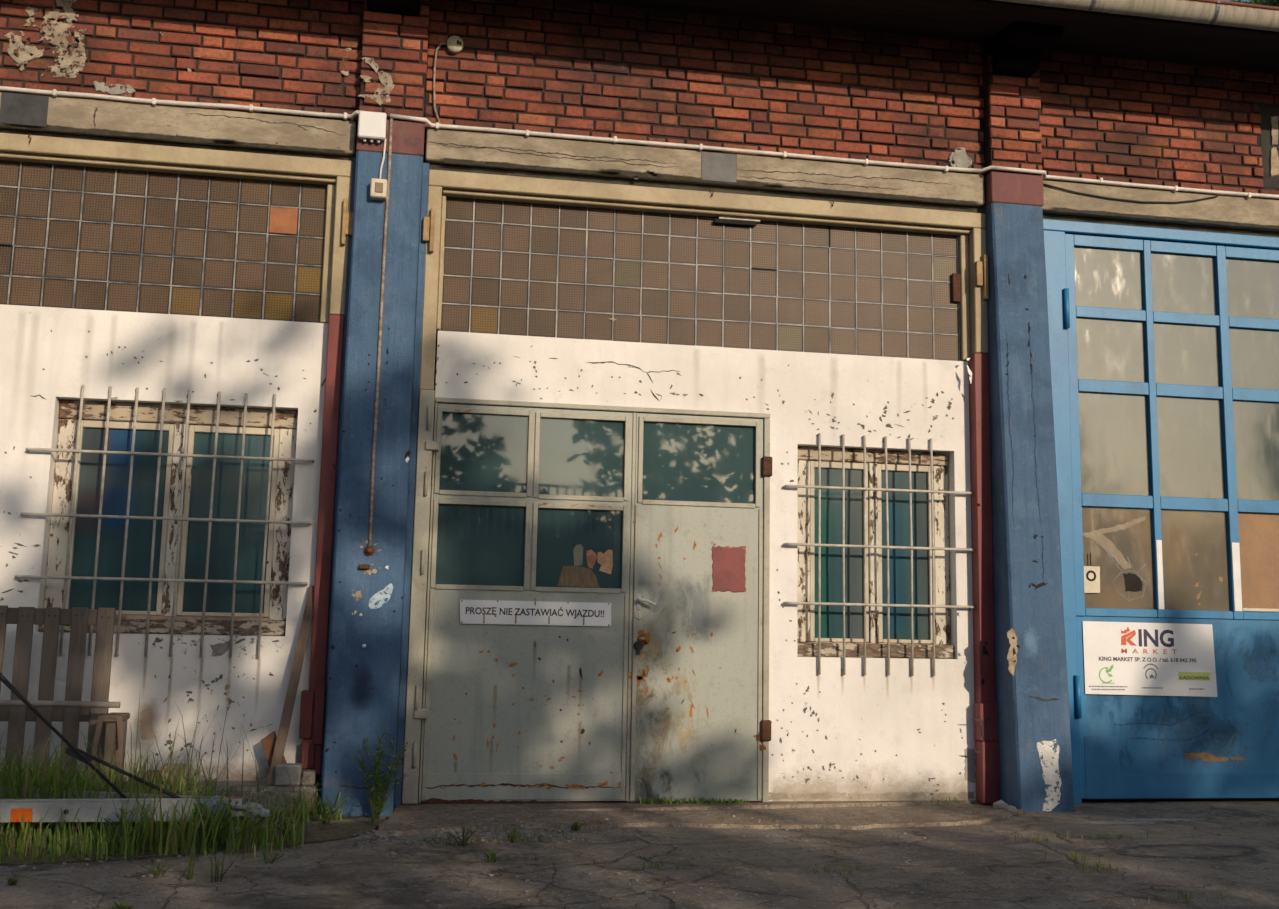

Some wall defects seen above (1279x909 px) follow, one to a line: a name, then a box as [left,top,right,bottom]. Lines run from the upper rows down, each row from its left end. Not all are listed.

peeling [4,0,89,78]
peeling [92,81,135,97]
peeling [358,57,395,106]
crack [588,361,679,400]
rust [627,666,650,694]
rust [418,730,624,804]
peeling [1037,739,1062,811]
rust [1183,752,1245,762]